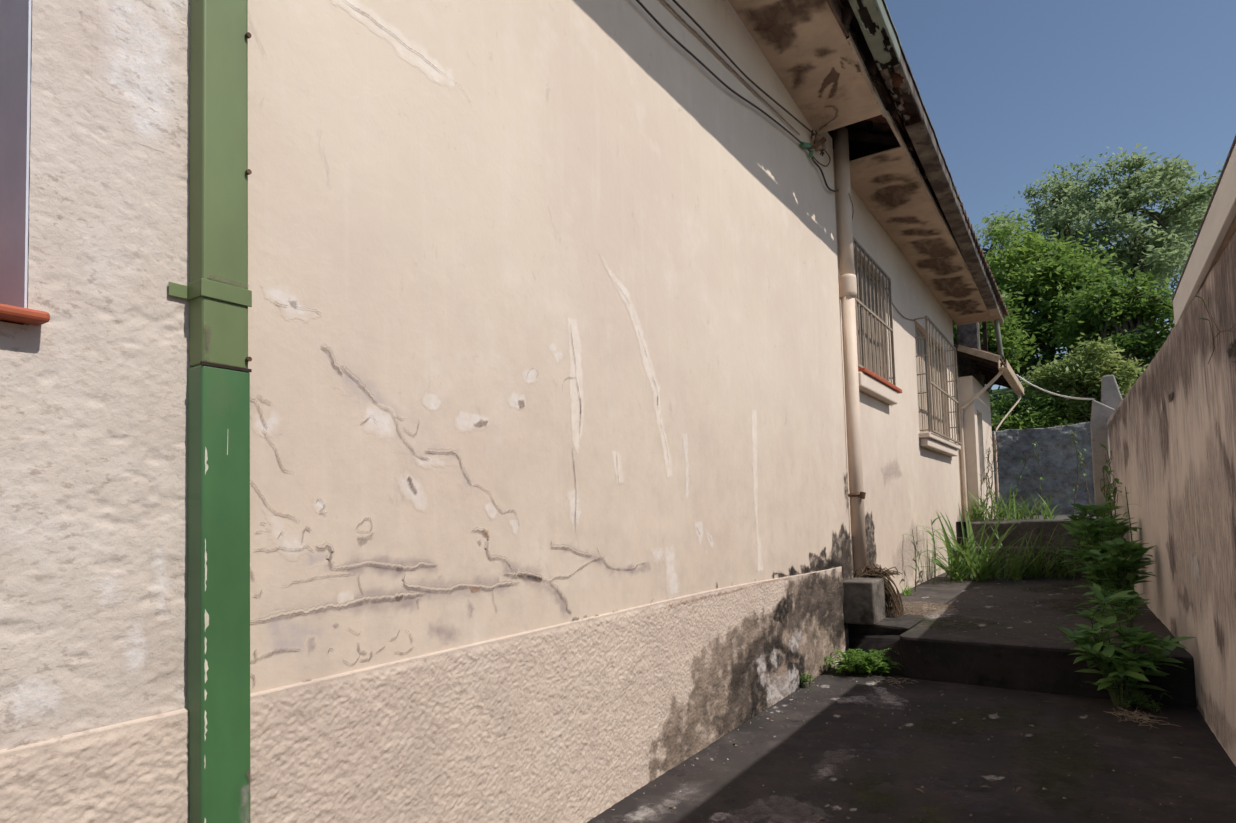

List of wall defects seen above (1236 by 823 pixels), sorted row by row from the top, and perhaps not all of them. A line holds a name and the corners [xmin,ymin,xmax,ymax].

crack [330,0,456,90]
water stain [749,0,826,49]
water stain [819,68,839,107]
water stain [873,155,983,315]
crack [250,315,653,678]
water stain [649,408,877,781]
water stain [1167,424,1236,653]
water stain [833,687,908,709]